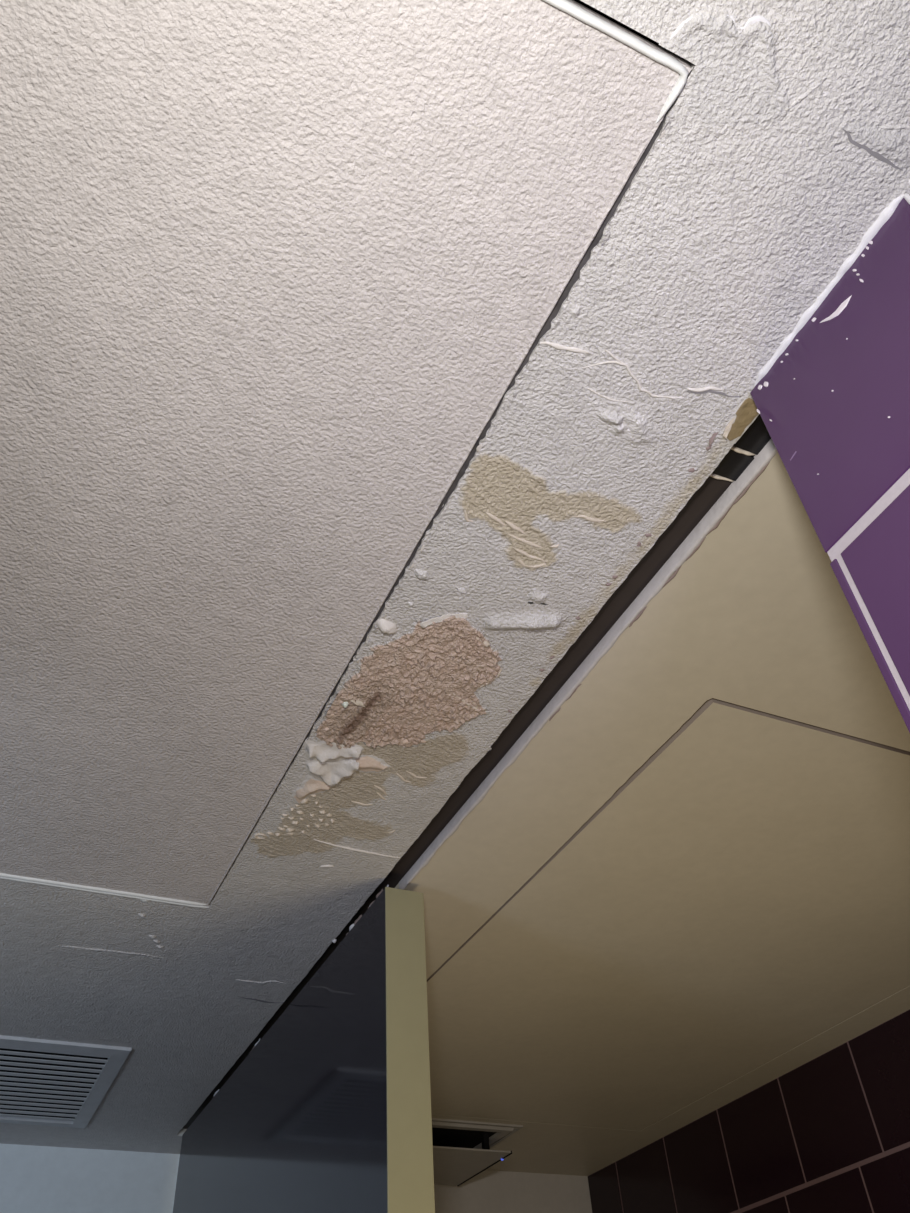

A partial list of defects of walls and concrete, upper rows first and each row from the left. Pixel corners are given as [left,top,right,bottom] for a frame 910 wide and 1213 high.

crack [843,125,910,171]
spalling [465,423,497,474]
damp [446,441,647,577]
peeling [291,585,508,804]
damp [246,726,492,867]